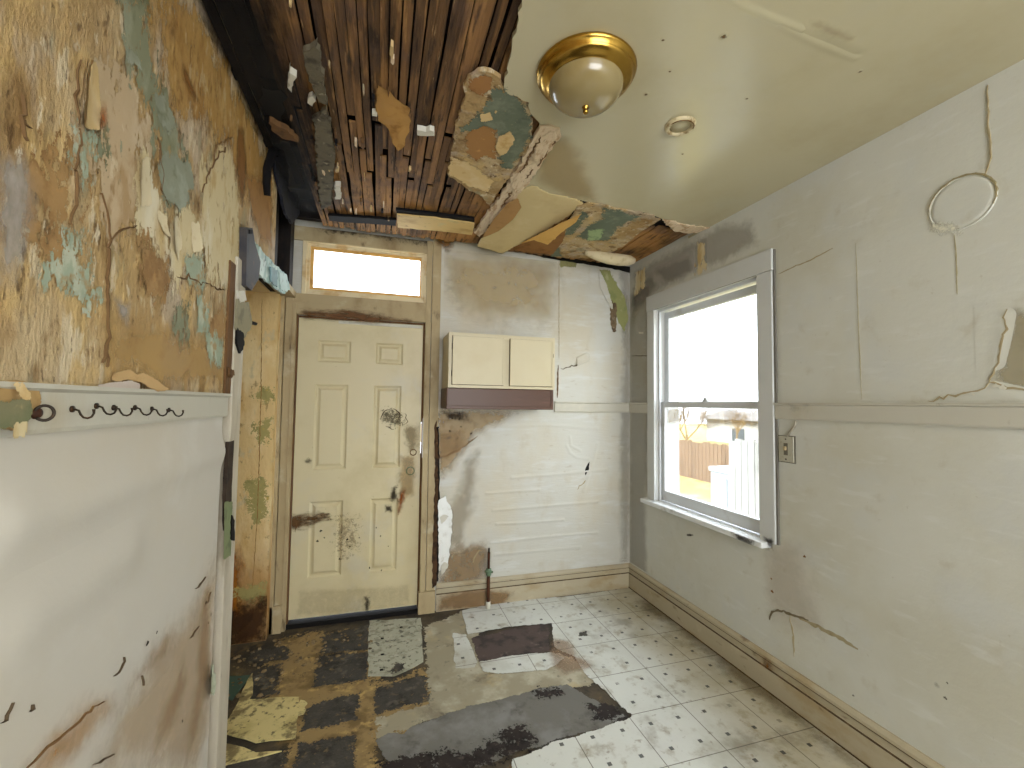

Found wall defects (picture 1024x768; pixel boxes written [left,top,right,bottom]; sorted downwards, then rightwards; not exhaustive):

peeling [0,0,258,378]
crack [202,137,232,192]
spalling [474,124,561,237]
crack [68,128,137,367]
crack [178,273,224,291]
peeling [255,242,290,294]
spalling [1000,315,1024,386]
damp [438,411,505,472]
damp [441,546,486,583]
damp [231,553,267,645]
crack [769,609,858,657]
damp [26,701,105,768]